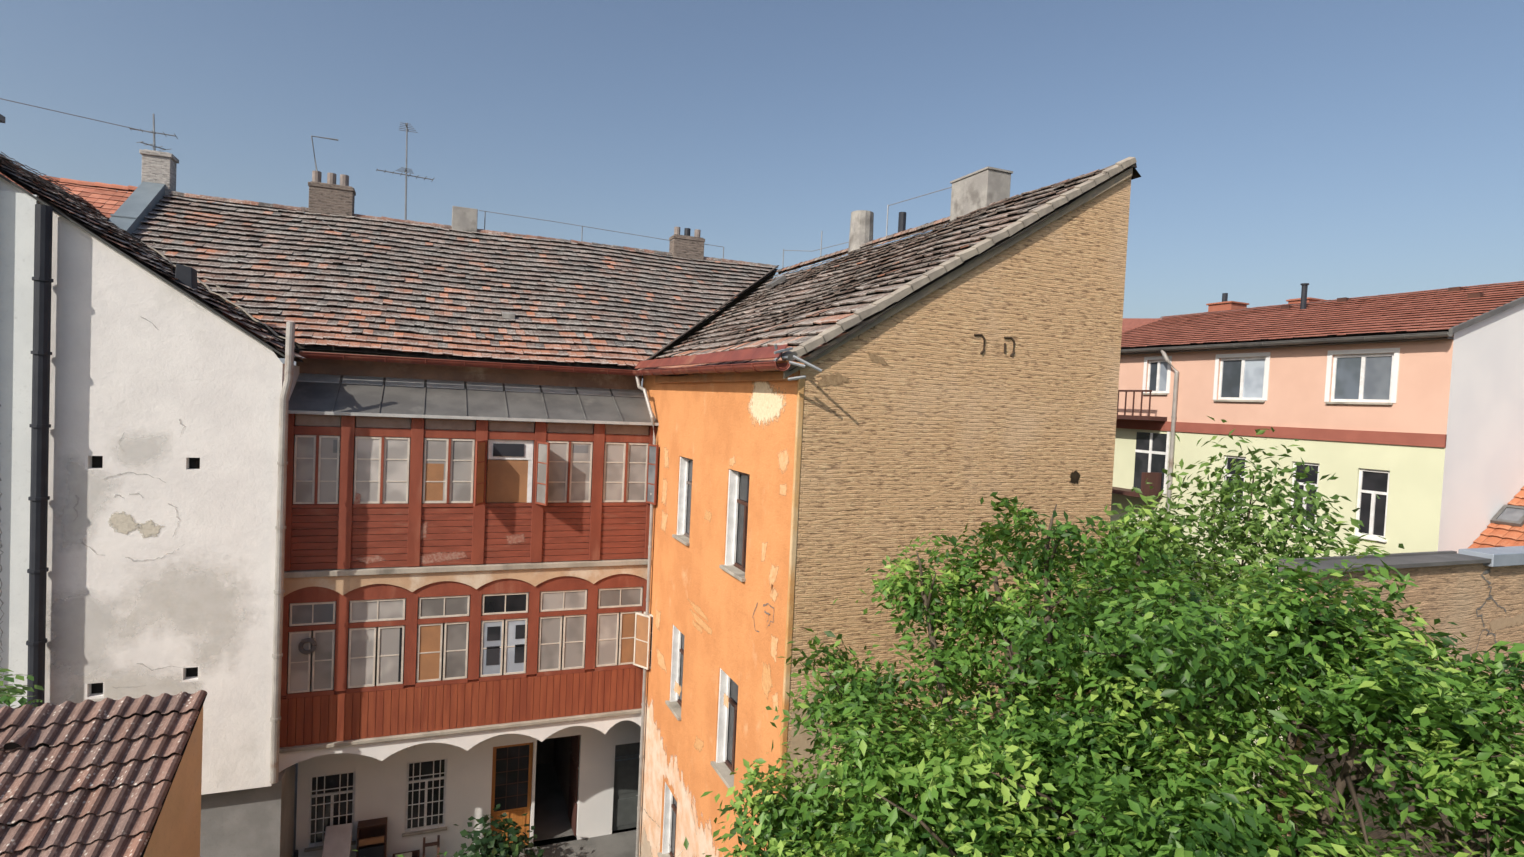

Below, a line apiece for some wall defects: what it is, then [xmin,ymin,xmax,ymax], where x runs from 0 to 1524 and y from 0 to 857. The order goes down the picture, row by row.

flaking render [748,381,786,429]
flaking render [109,511,164,538]
flaking render [639,696,724,857]